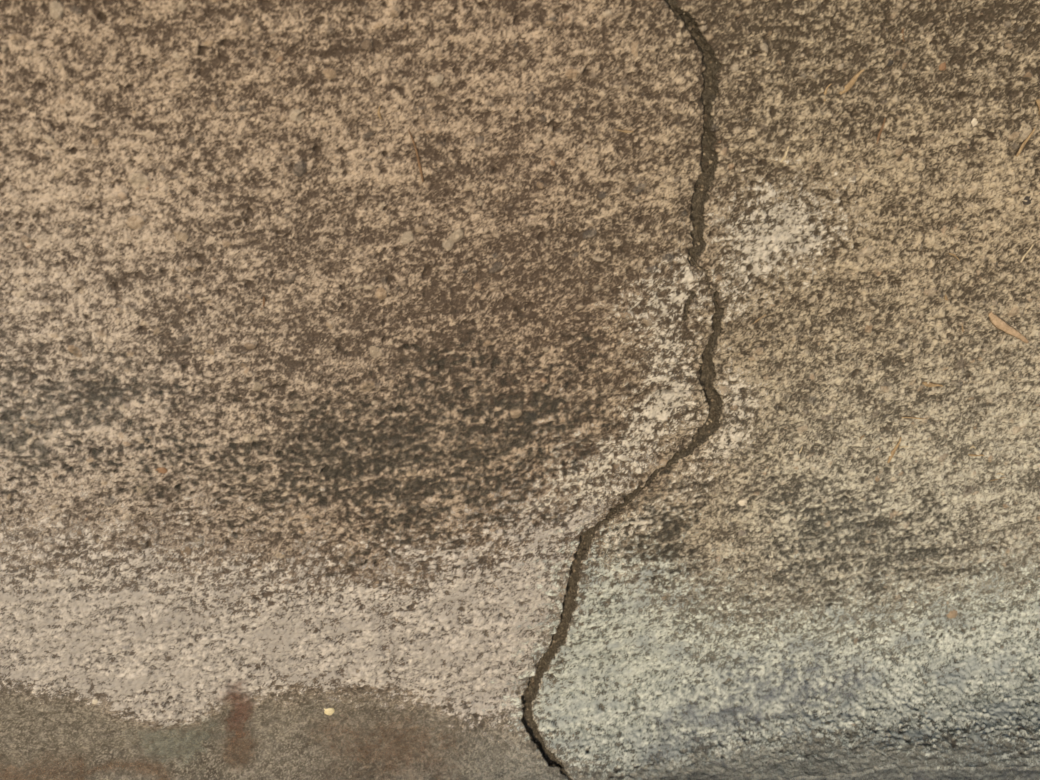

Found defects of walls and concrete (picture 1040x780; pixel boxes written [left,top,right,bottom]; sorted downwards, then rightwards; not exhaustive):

damp [0,158,1040,780]
crack [521,0,723,780]